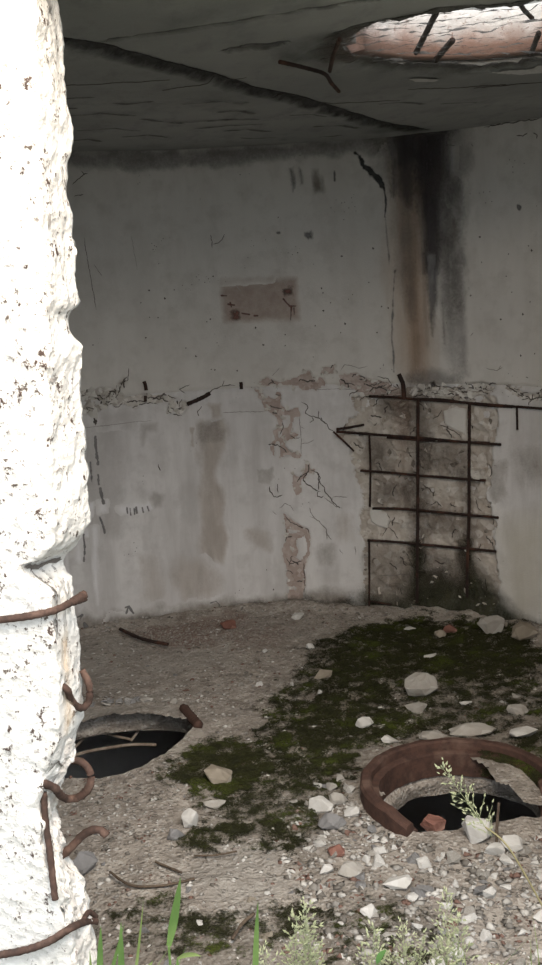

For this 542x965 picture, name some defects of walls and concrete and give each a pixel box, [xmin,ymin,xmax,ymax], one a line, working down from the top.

crack [66,77,246,91]
water stain [67,130,478,383]
peeling [114,489,167,518]
water stain [64,400,361,629]
spalling [237,364,542,606]
crack [269,365,542,590]
water stain [92,436,542,965]